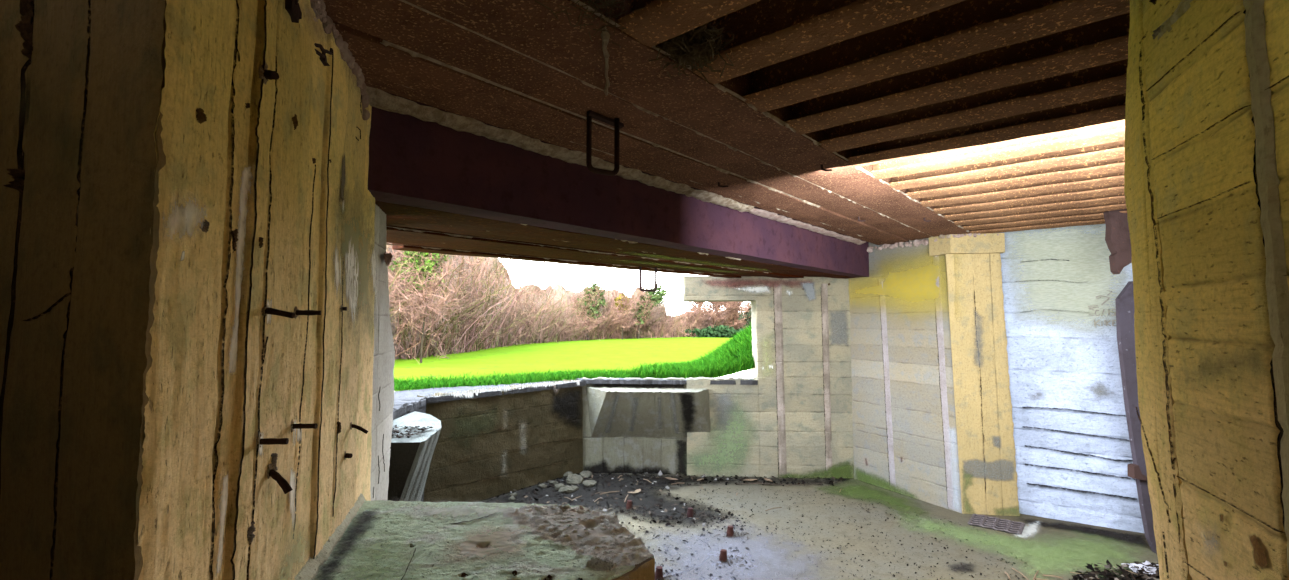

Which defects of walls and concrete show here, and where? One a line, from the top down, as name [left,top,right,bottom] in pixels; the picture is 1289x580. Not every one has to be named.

rust [1250,534,1267,568]